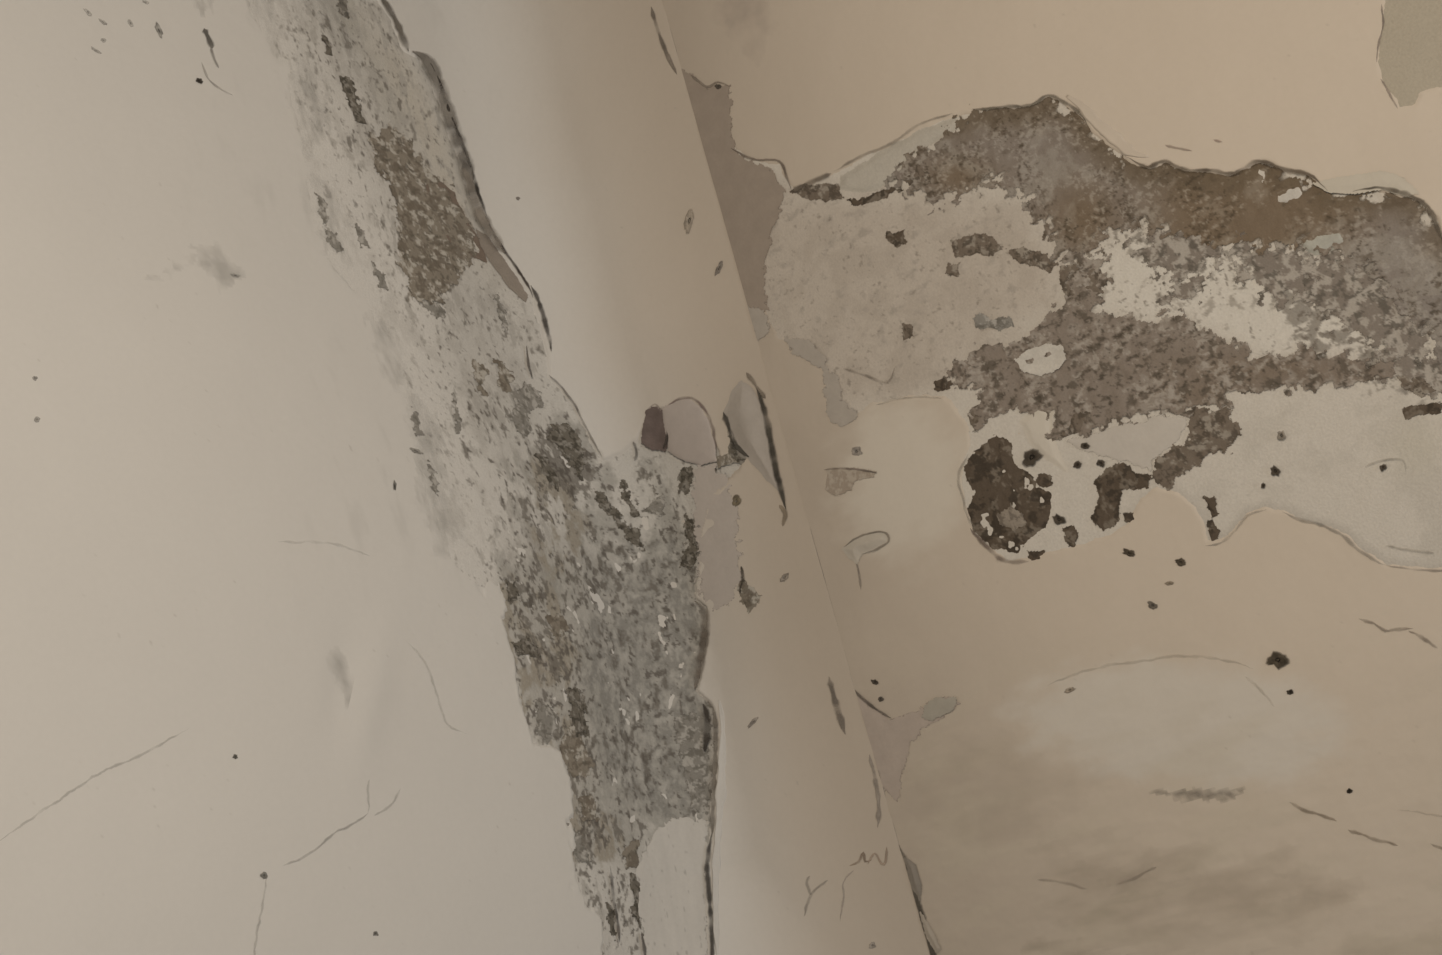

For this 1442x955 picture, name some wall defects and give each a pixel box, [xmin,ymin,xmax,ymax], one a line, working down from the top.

flaking render [247,0,787,955]
flaking render [651,0,1442,568]